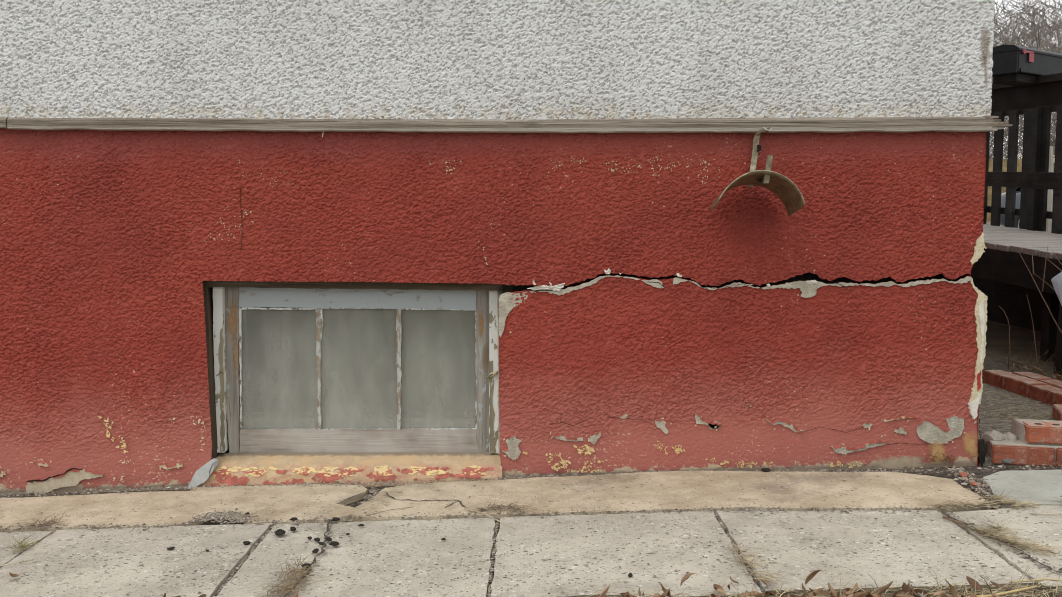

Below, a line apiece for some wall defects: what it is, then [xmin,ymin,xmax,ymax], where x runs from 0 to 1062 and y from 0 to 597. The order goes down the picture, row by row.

crack [526,269,972,295]
spalling [830,232,988,468]
peeling [26,416,131,494]
peeling [501,434,528,460]
peeling [546,431,607,473]
peeling [654,417,685,455]
peeling [695,412,725,436]
peeling [209,465,494,487]
crack [284,492,465,597]